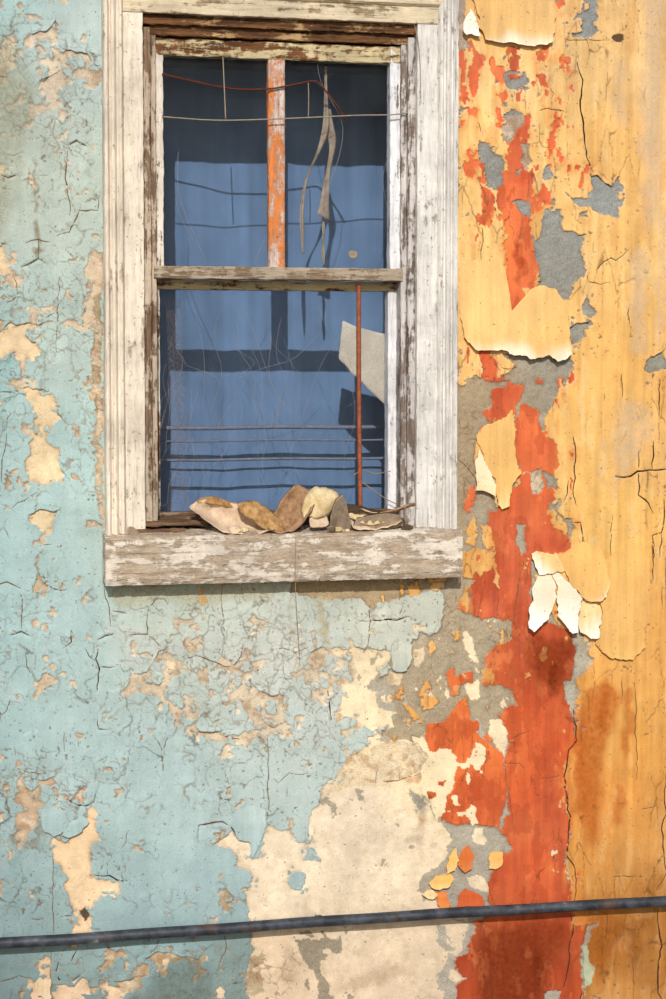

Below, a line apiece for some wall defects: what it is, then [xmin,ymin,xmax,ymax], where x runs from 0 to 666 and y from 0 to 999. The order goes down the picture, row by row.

peeling [31,17,102,93]
crack [57,150,99,236]
peeling [0,316,60,361]
peeling [84,250,105,529]
peeling [20,382,67,492]
peeling [210,0,651,999]
crack [615,441,666,608]
crack [63,630,111,686]
crack [104,588,168,643]
crack [189,592,243,669]
crack [261,737,307,823]
peeling [15,769,121,934]